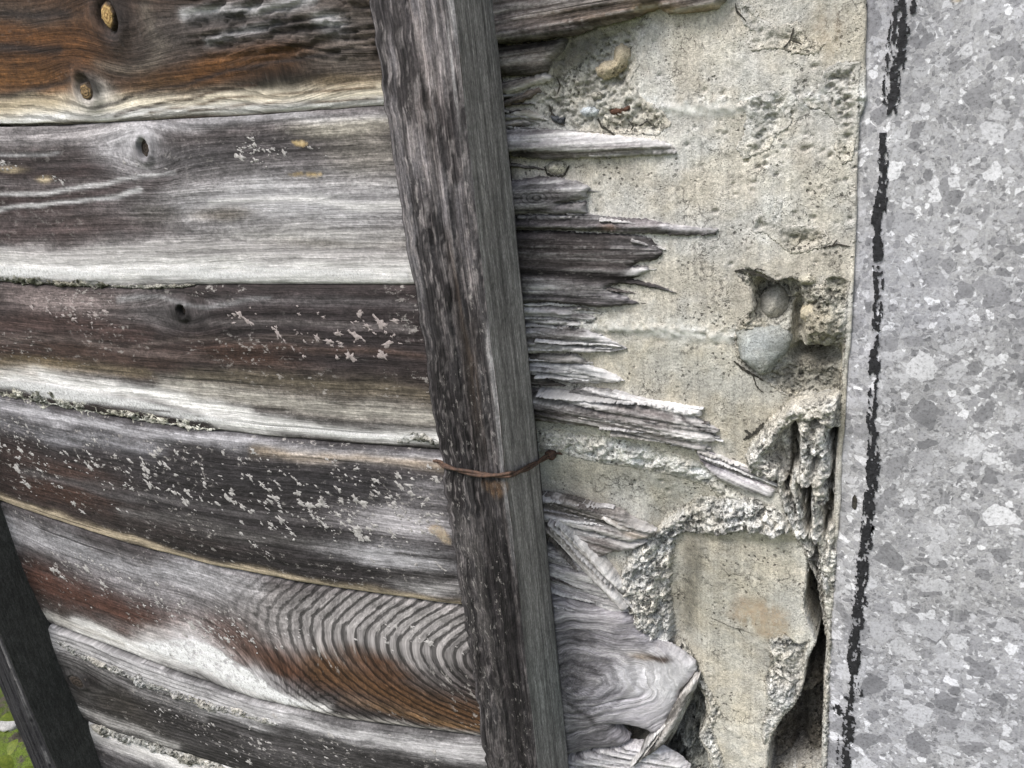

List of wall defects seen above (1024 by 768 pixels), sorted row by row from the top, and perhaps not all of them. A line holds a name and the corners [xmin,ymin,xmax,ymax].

spalling [619,267,851,768]